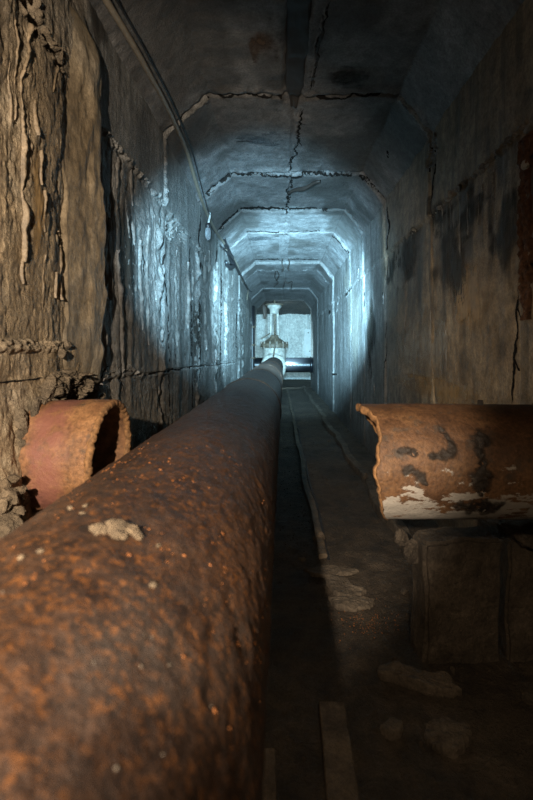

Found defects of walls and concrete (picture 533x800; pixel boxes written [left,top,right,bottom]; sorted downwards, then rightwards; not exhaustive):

spalling [18,0,65,75]
spalling [101,126,164,204]
crack [95,92,391,408]
water stain [386,227,418,284]
water stain [426,172,517,304]
crack [0,376,42,384]
spalling [14,364,144,450]
crack [511,299,521,402]
spalling [20,479,31,521]